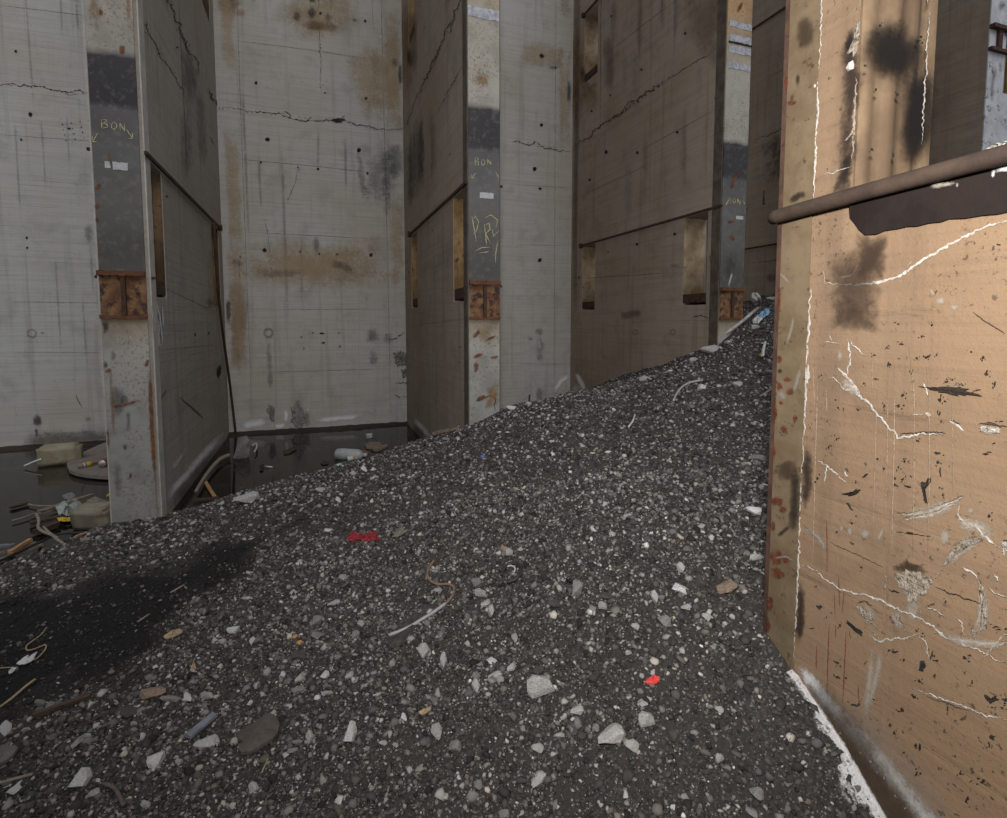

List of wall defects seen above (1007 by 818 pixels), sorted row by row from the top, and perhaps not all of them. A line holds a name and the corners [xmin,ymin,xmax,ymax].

crack [2,81,84,95]
crack [145,0,462,130]
crack [513,48,716,152]